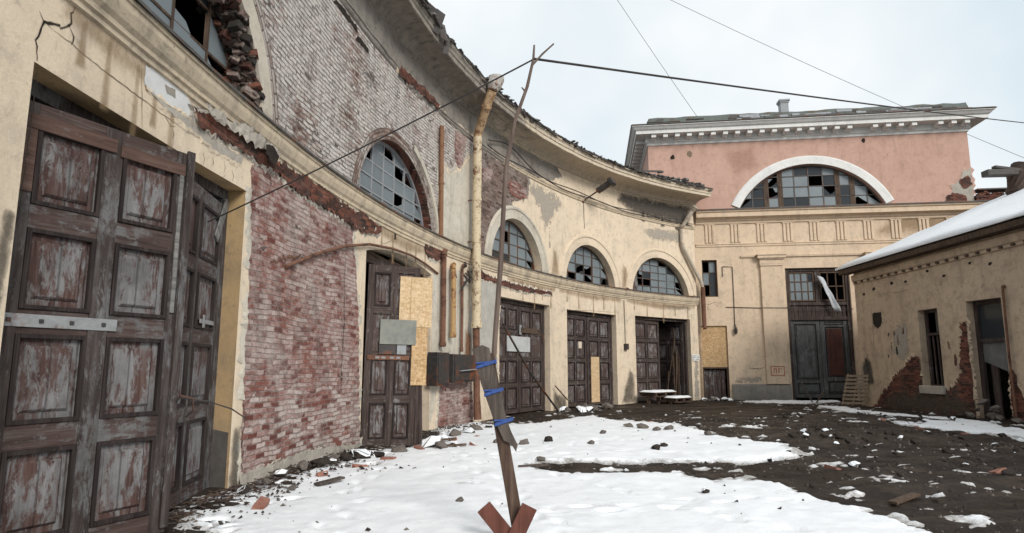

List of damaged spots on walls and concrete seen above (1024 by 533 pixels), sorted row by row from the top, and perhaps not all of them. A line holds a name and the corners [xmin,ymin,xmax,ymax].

crack [16,7,189,229]
flaking render [196,0,562,253]
spalling [946,166,976,201]
flaking render [144,66,396,485]
peeling [424,243,553,379]
flaking render [872,311,980,418]
flaking render [1008,370,1024,420]